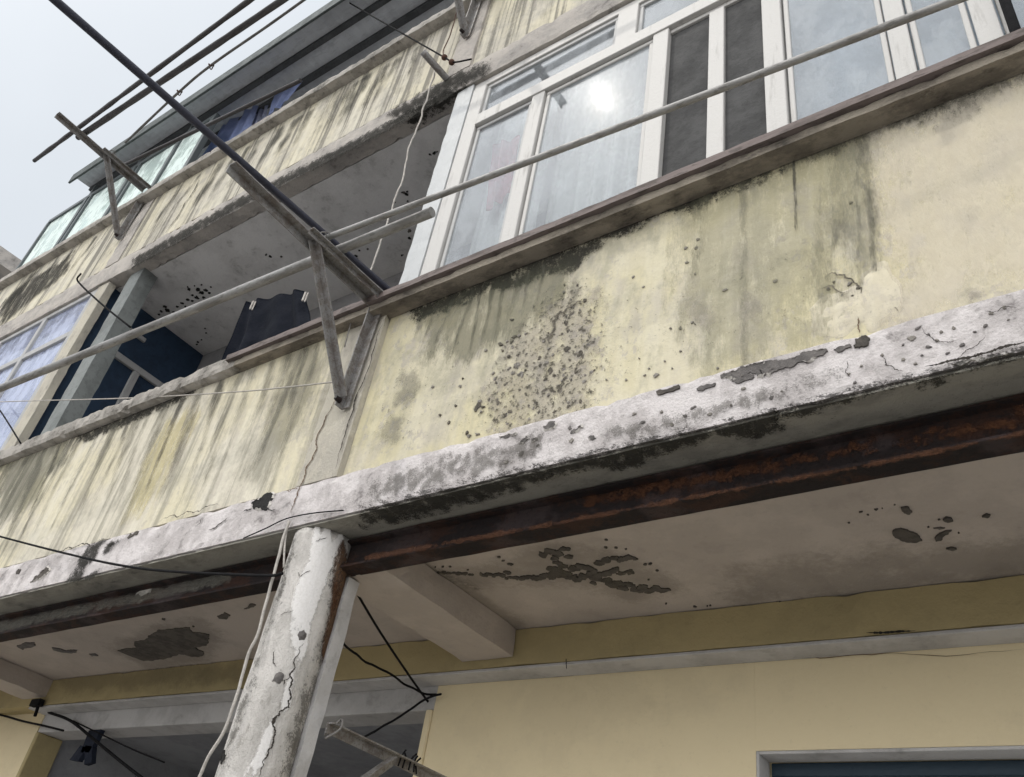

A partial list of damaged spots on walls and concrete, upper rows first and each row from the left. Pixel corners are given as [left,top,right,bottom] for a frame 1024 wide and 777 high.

leakage [264,47,492,191]
leakage [0,236,97,325]
leakage [407,75,1024,438]
spalling [243,492,276,512]
crack [287,321,384,507]
leakage [358,346,1024,530]
corrosion [365,415,1024,560]
peeling [696,335,870,391]
peeling [118,618,209,661]
corrosion [321,540,348,660]
peeling [434,539,671,605]
crack [260,645,303,775]